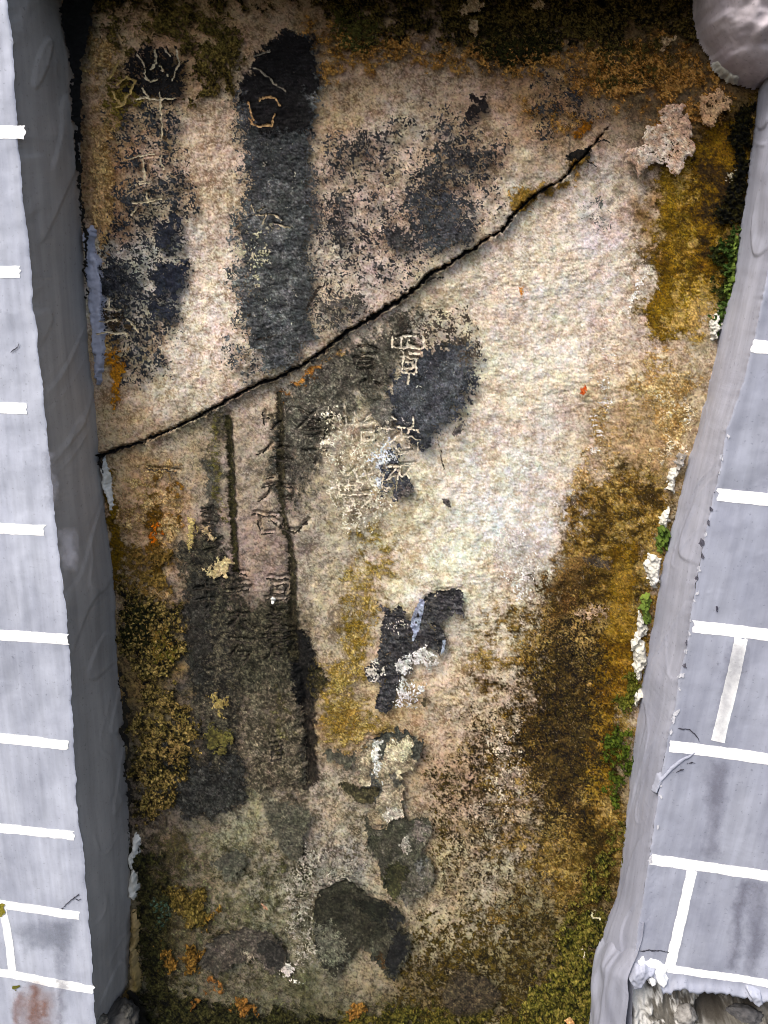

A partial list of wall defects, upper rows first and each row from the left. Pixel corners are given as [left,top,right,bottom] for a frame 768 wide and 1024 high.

damp [75,30,122,299]
damp [91,319,133,415]
damp [103,303,426,865]
crack [95,127,610,473]
damp [298,14,758,1024]
damp [279,841,367,984]